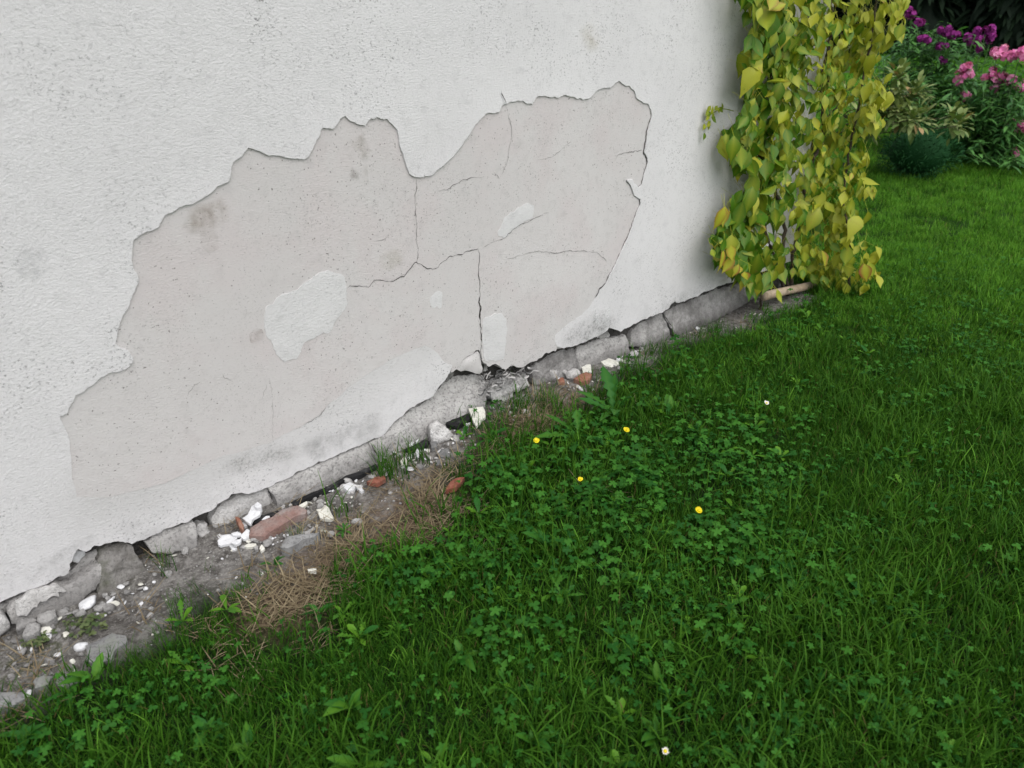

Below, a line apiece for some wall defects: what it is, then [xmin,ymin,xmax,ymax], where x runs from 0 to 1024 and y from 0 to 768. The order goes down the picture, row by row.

crack [447,93,512,190]
crack [355,112,651,359]
peeling [60,81,651,498]
peeling [217,502,270,552]
peeling [299,501,334,522]